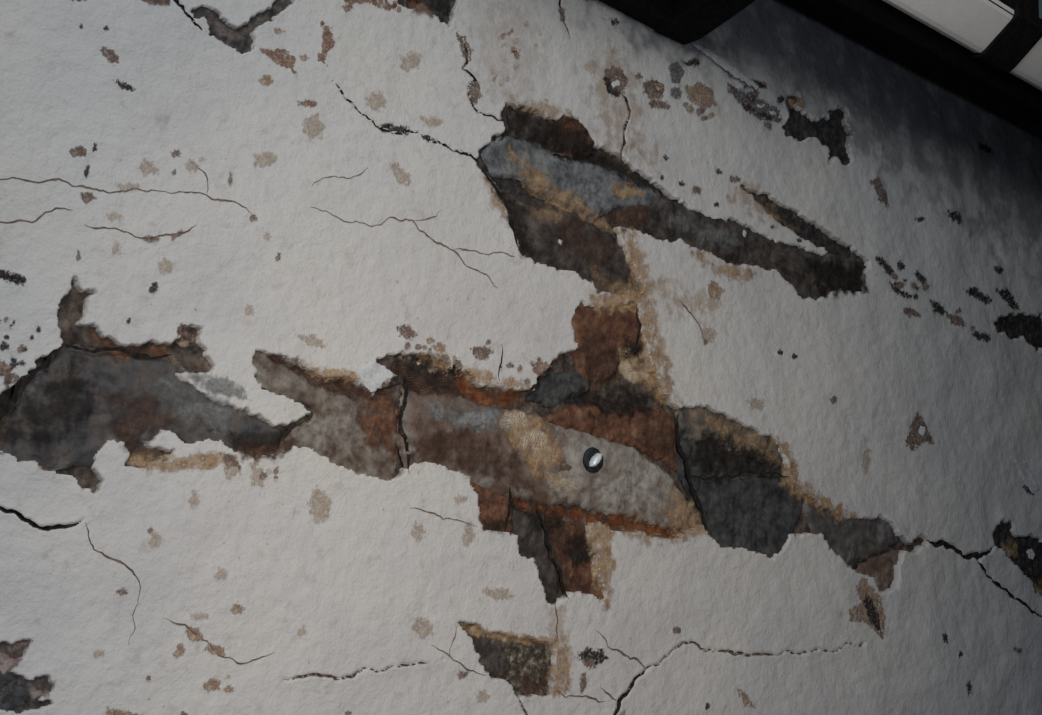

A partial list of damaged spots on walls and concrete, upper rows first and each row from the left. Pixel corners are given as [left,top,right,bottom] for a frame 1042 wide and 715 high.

spalling [343,0,472,62]
spalling [603,44,850,165]
rust [590,228,673,404]
rust [296,364,360,389]
rust [418,353,530,389]
spalling [0,100,1042,639]
crack [0,506,141,640]
crack [926,540,1042,617]
spalling [0,640,54,714]
crack [284,627,483,680]
spalling [458,622,554,697]
crack [558,631,863,715]